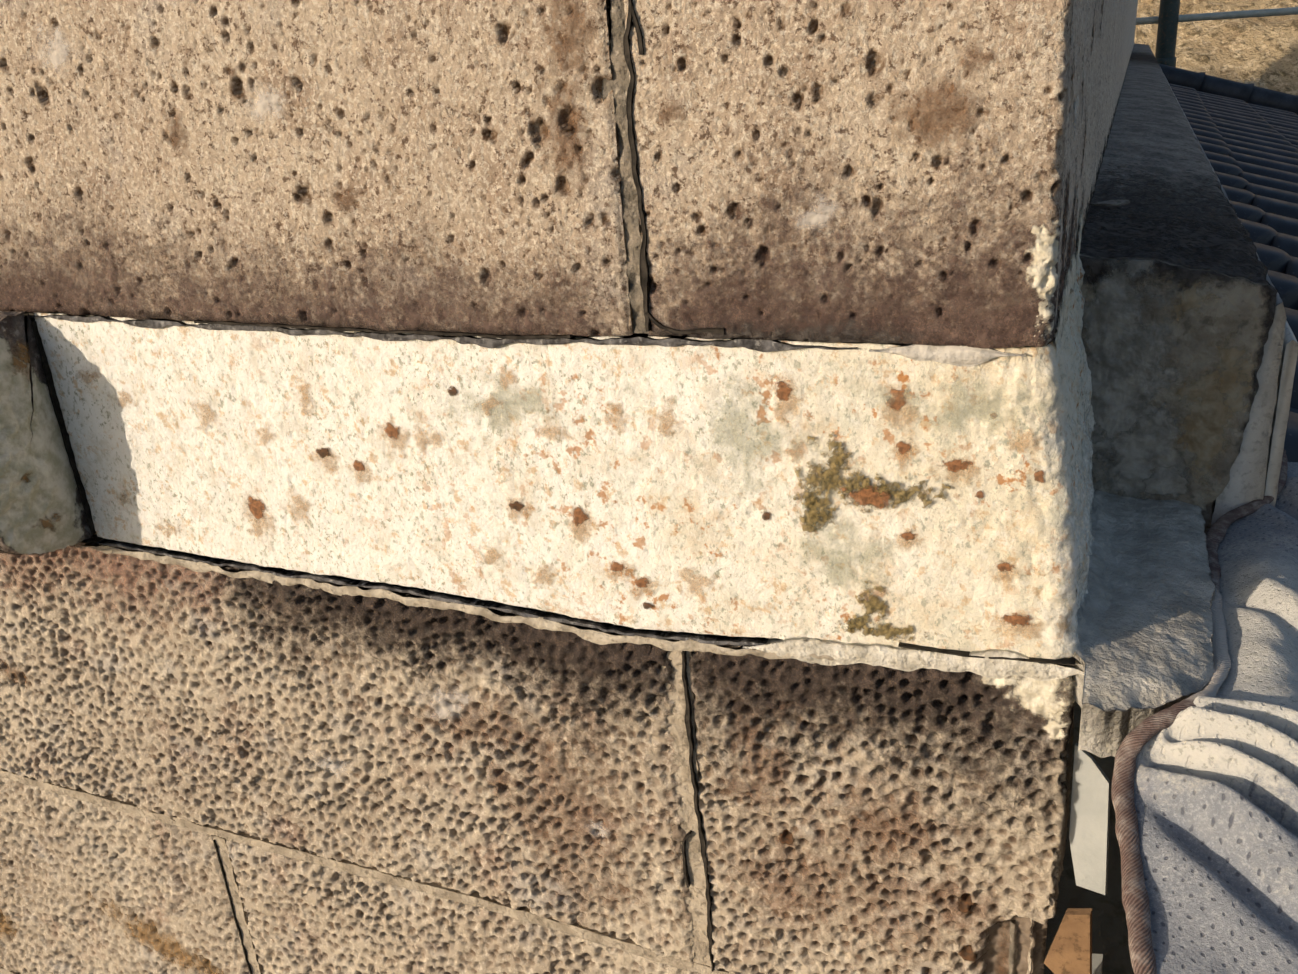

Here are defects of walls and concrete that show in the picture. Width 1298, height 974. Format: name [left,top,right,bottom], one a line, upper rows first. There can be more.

damp [0,209,628,336]
damp [648,49,1278,500]
spalling [0,338,84,555]
corrosion [248,496,264,519]
corrosion [777,381,792,401]
corrosion [943,459,973,472]
damp [0,545,673,748]
corrosion [610,562,653,609]
corrosion [1002,613,1031,626]
damp [692,645,1074,819]
crack [681,651,715,972]
damp [779,829,795,845]